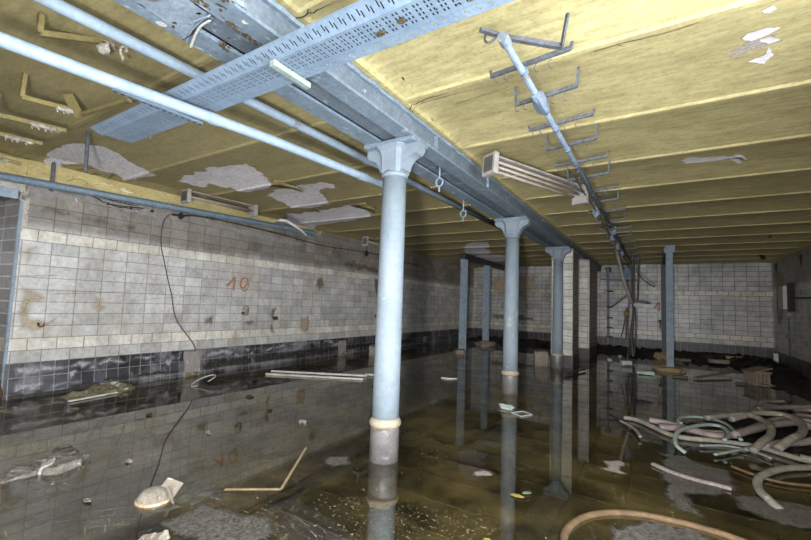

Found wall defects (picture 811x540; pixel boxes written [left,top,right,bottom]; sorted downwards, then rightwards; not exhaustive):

corrosion [193,0,261,52]
peeling [714,27,782,64]
peeling [43,143,155,181]
peeling [681,154,748,164]
peeling [0,164,376,246]